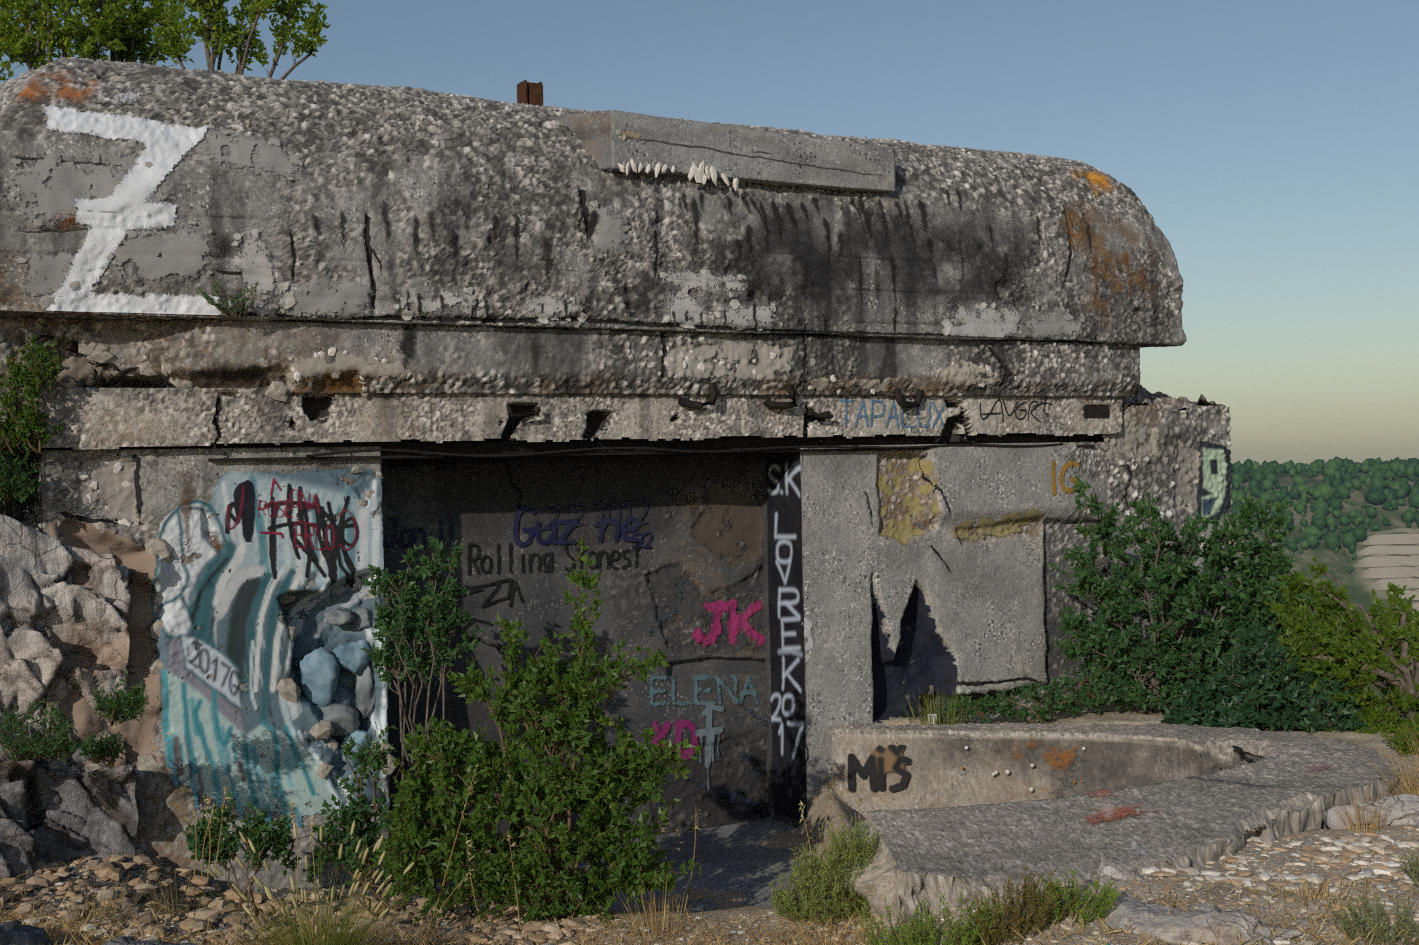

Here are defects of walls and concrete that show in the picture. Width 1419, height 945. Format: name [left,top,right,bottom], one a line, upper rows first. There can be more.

damp [412,209,435,262]
damp [493,213,519,265]
damp [587,210,598,241]
damp [682,191,703,241]
damp [725,191,1026,331]
damp [393,291,422,368]
spalling [660,267,793,381]
peeling [941,302,1085,339]
spalling [10,332,413,432]
spalling [499,402,541,440]
spalling [583,410,611,441]
spalling [797,361,1017,444]